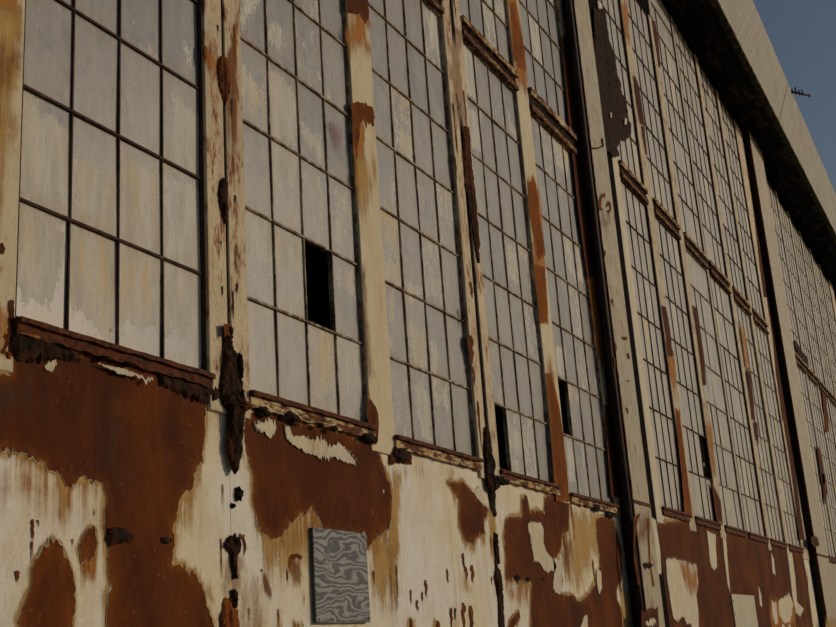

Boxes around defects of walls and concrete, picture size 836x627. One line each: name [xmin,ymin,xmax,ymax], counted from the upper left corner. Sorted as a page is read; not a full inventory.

rust [346,0,371,54]
rust [508,0,529,94]
rust [527,176,548,325]
rust [561,37,603,366]
rust [692,305,706,385]
rust [0,297,214,627]
rust [242,393,400,610]
rust [446,478,489,590]
rust [502,365,631,627]
rust [633,408,814,627]
rust [817,447,828,505]
rust [450,602,474,627]